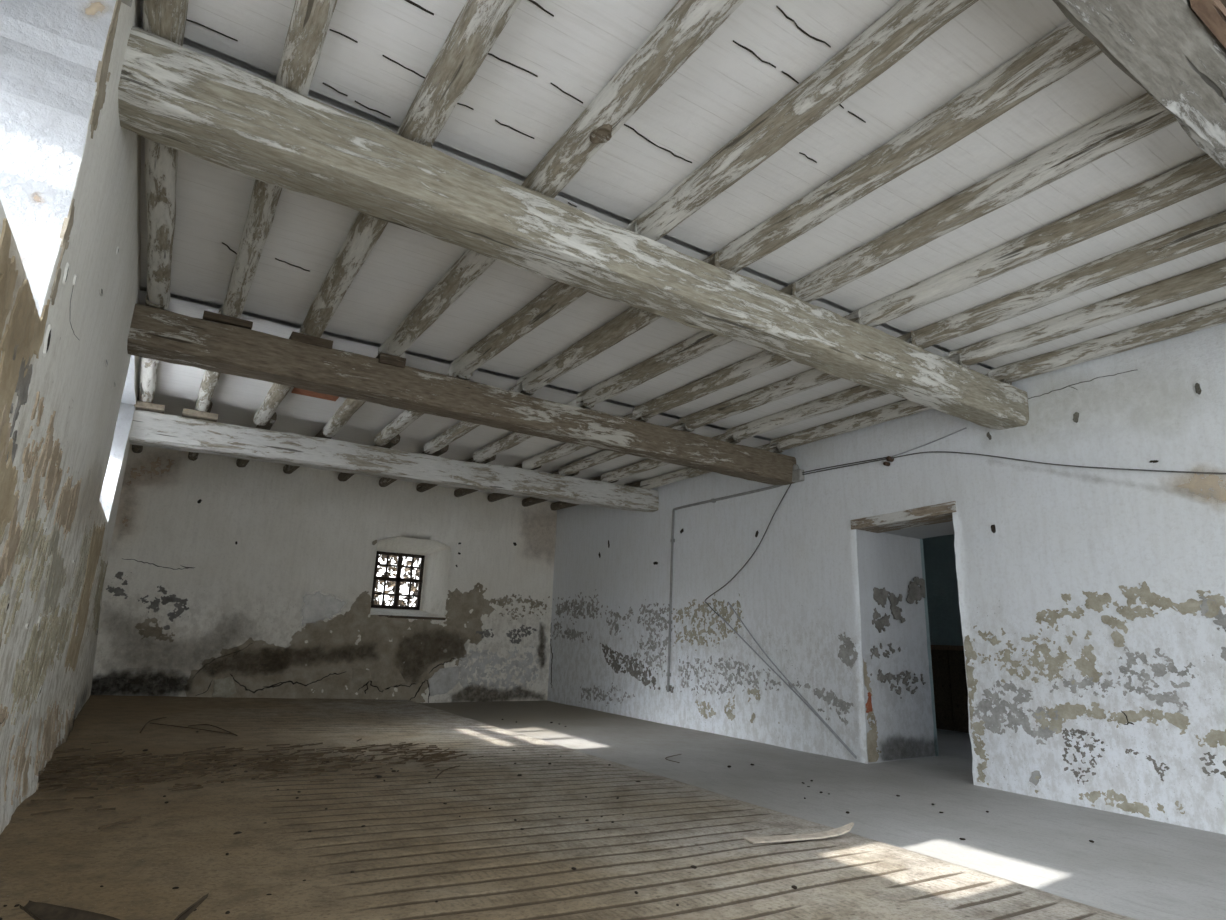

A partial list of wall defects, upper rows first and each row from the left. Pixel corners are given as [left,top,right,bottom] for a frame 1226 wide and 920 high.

spalling [90,0,121,139]
peeling [0,199,189,805]
leakage [209,646,375,675]
leakage [538,624,546,666]
flaking render [185,577,926,762]
leakage [74,672,190,716]
leakage [452,686,543,702]